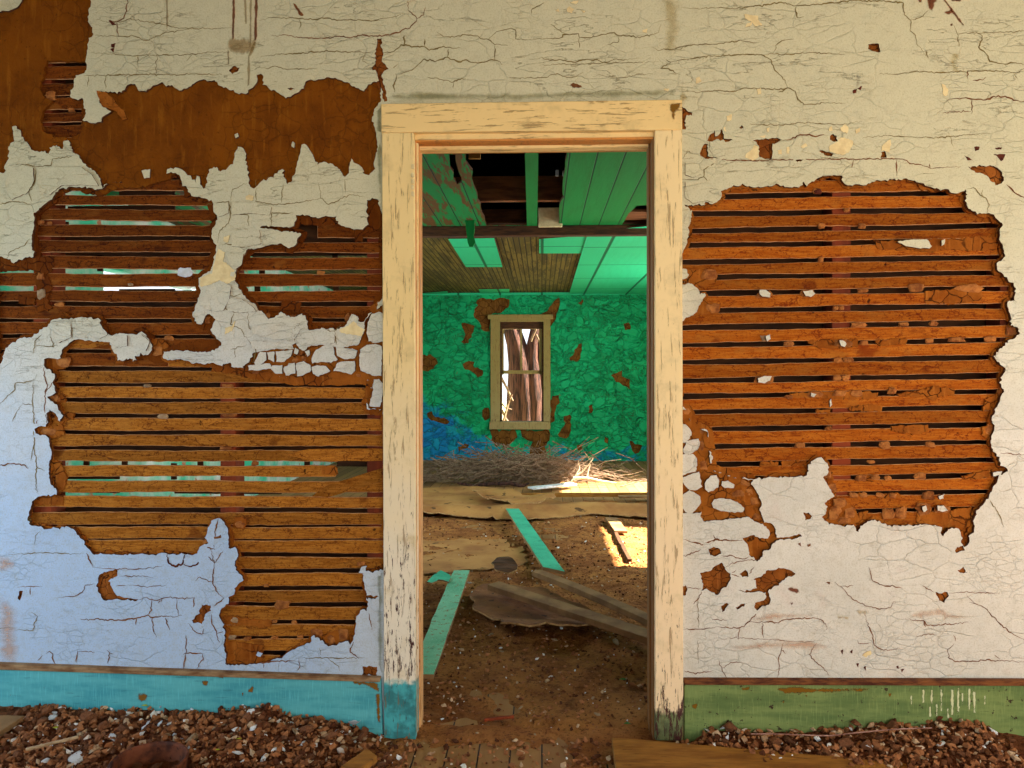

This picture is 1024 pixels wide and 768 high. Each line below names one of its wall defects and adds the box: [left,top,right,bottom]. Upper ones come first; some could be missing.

crack [85,0,232,86]
crack [259,0,1024,180]
flaking render [745,127,807,162]
flaking render [964,146,1005,185]
flaking render [0,0,388,664]
flaking render [682,176,1018,560]
peeling [482,395,582,458]
crack [0,521,224,668]
crack [683,537,757,577]
flaking render [700,547,795,611]
crack [685,586,828,678]
crack [835,568,1024,663]